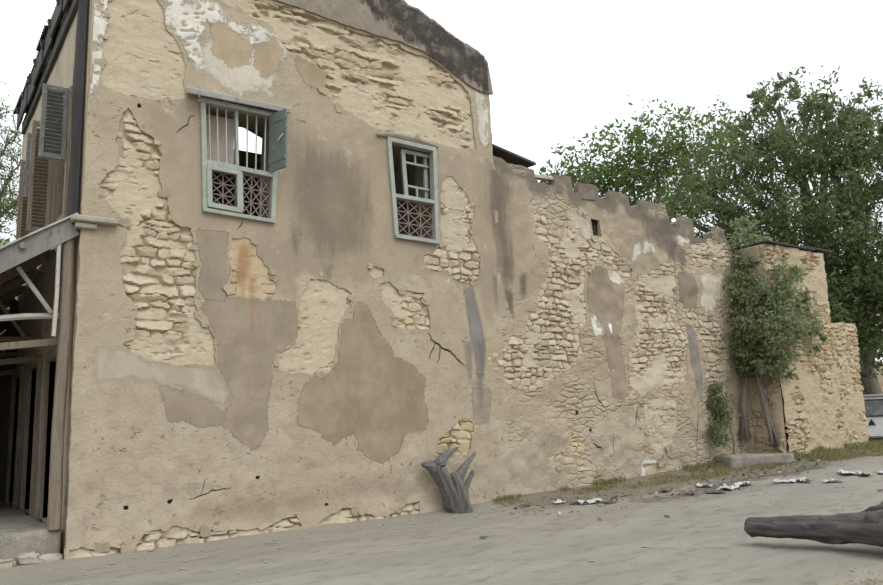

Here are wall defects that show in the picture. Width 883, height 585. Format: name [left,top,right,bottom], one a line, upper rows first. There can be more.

leakage [361,0,489,93]
spalling [90,0,489,379]
leakage [464,288,484,377]
spalling [488,198,733,476]
spalling [436,418,474,457]
spalling [64,514,301,560]
spalling [319,502,419,525]